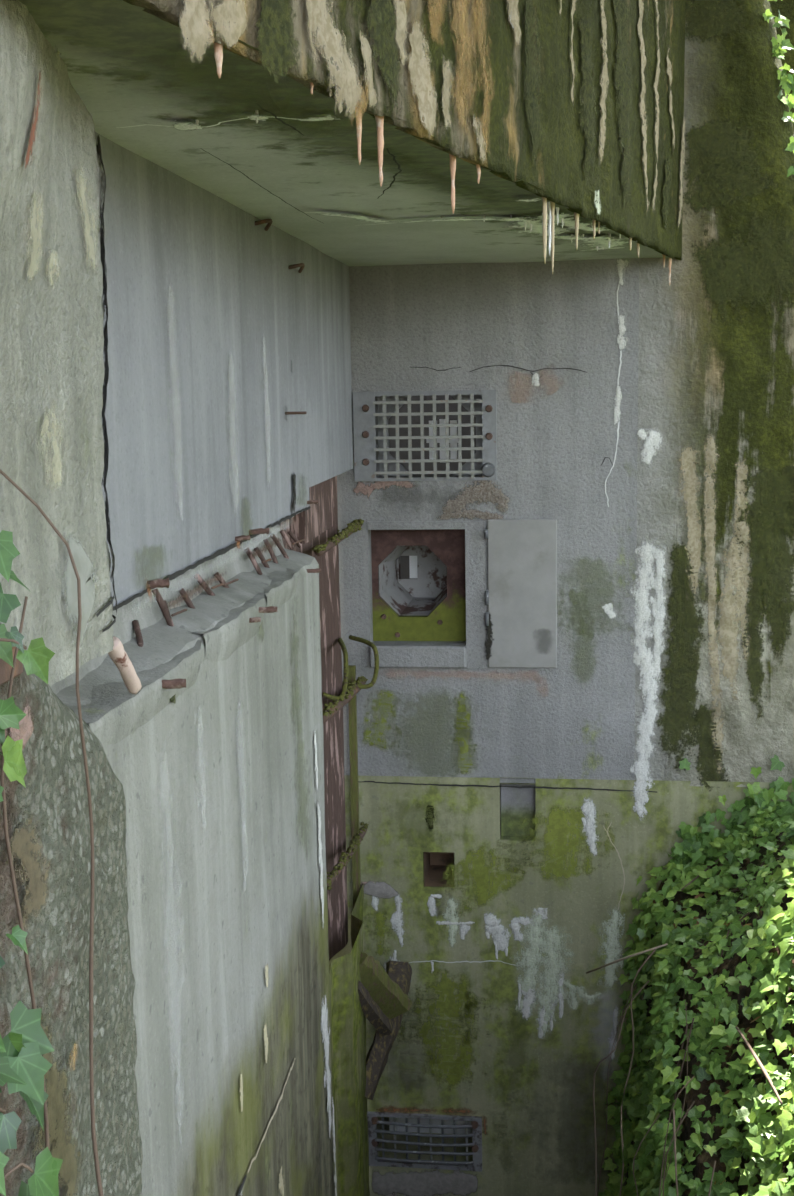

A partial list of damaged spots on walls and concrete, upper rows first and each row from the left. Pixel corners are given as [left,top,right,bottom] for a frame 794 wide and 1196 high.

crack [116,103,533,225]
leakage [508,0,685,251]
crack [415,365,585,378]
crack [601,259,629,507]
spalling [437,480,510,520]
leakage [602,603,617,619]
leakage [629,434,794,820]
leakage [314,730,324,929]
leakage [368,894,405,971]
leakage [427,894,625,1039]
crack [237,1058,295,1196]
leakage [321,996,337,1196]